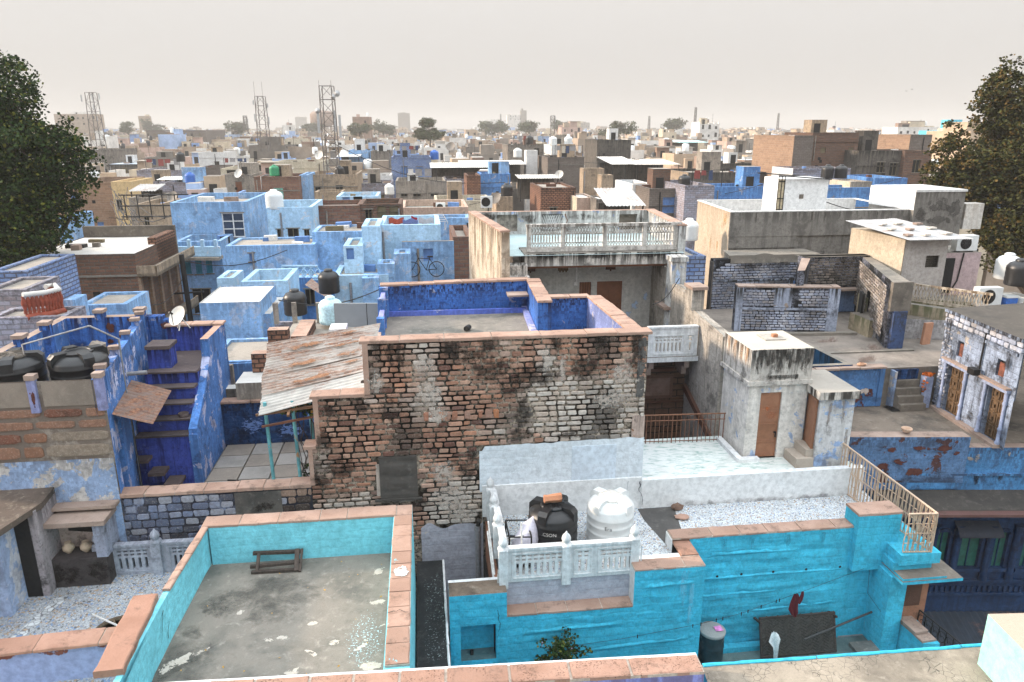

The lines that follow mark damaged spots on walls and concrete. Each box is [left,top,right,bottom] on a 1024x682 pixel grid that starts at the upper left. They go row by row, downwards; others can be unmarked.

water stain [354,374,402,420]
water stain [372,344,447,423]
water stain [444,338,597,441]
water stain [594,335,644,408]
water stain [756,348,812,380]
water stain [314,406,355,487]
water stain [382,450,477,519]
peeling [877,447,923,476]
peeling [913,446,960,455]